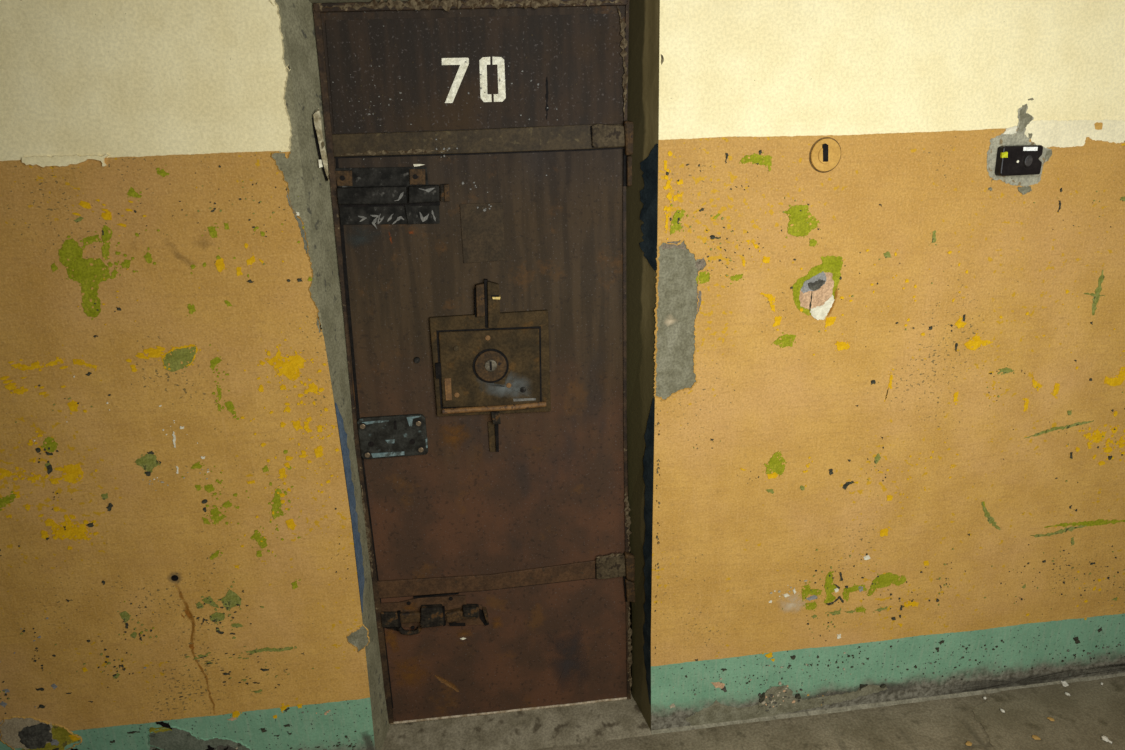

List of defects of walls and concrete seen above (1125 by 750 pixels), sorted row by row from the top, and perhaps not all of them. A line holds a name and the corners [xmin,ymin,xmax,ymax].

flaking render [270,0,324,336]
peeling [312,108,330,181]
peeling [987,98,1125,203]
peeling [173,181,267,283]
flaking render [760,197,857,362]
peeling [950,314,993,352]
peeling [126,339,370,653]
flaking render [639,144,772,705]
peeling [737,451,786,494]
rust [171,575,215,705]
flaking render [127,721,251,750]
peeling [261,703,372,750]